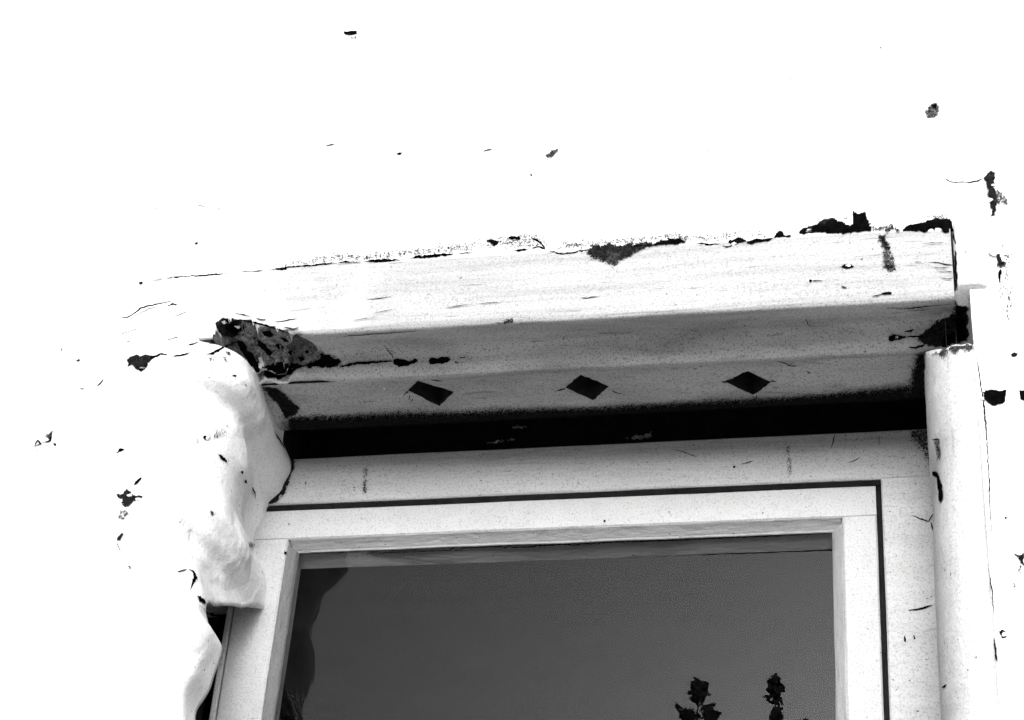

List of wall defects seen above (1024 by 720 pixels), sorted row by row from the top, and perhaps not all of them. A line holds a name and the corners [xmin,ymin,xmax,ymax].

spalling [983,169,1010,216]
spalling [634,231,691,248]
spalling [722,209,873,248]
spalling [903,213,954,233]
spalling [222,321,242,336]
spalling [941,306,966,346]
spalling [262,331,309,362]
spalling [979,389,1024,406]
spalling [116,477,143,520]